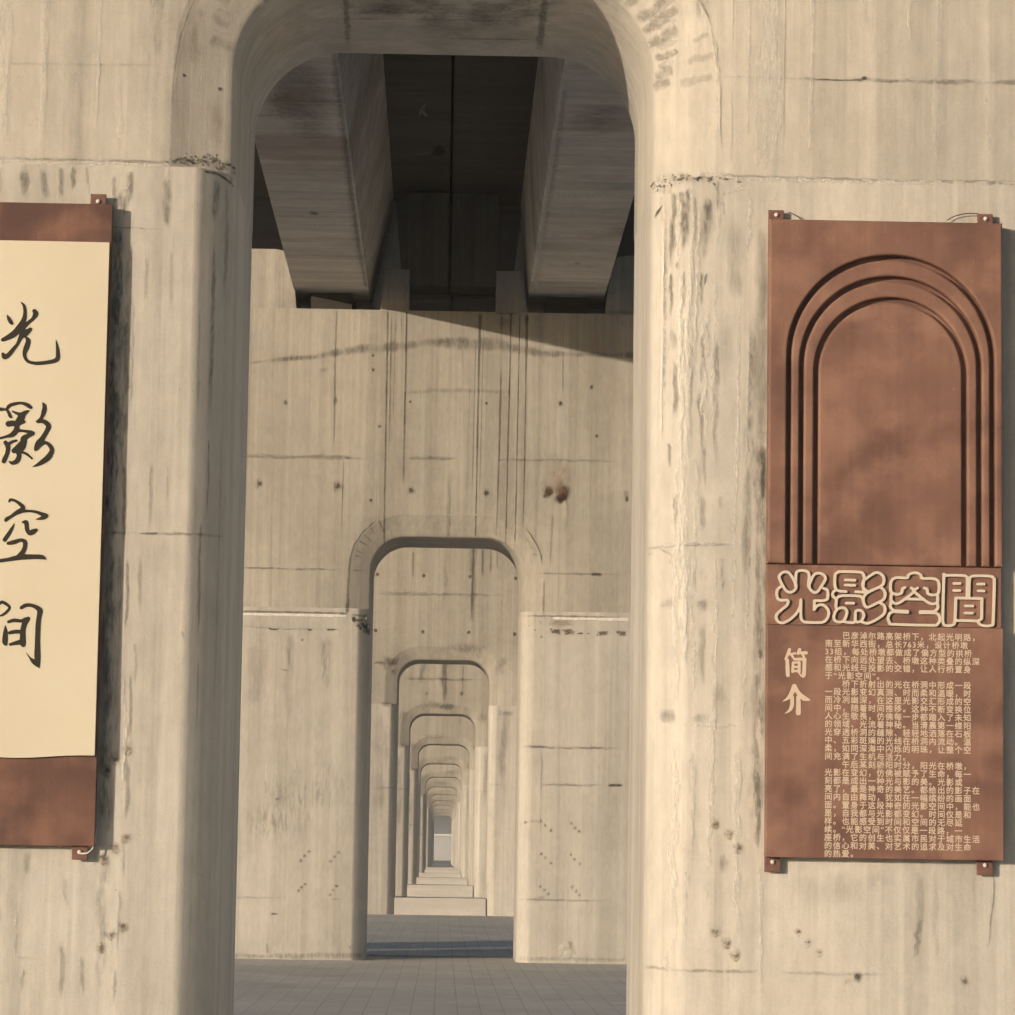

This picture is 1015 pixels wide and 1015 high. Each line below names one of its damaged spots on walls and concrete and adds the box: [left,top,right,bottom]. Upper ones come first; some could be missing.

rust [544,483,568,503]